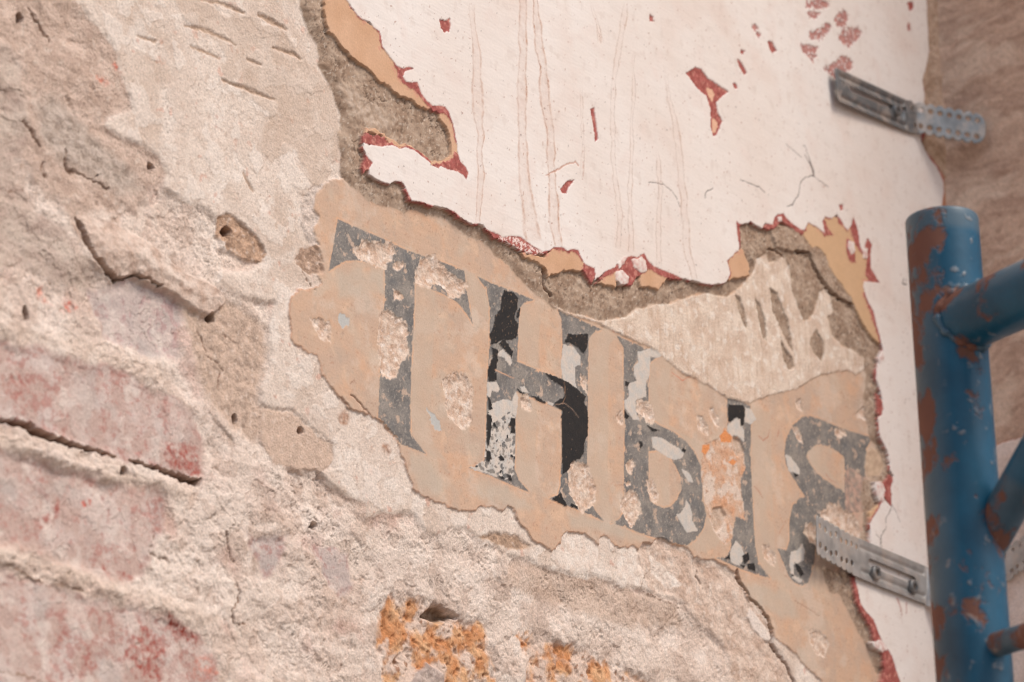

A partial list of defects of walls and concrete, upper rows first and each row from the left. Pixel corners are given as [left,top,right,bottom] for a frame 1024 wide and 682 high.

crack [74,216,163,288]
flaking render [215,213,267,262]
flaking render [295,181,326,275]
flaking render [300,0,894,546]
crack [0,418,202,486]
flaking render [479,531,531,550]